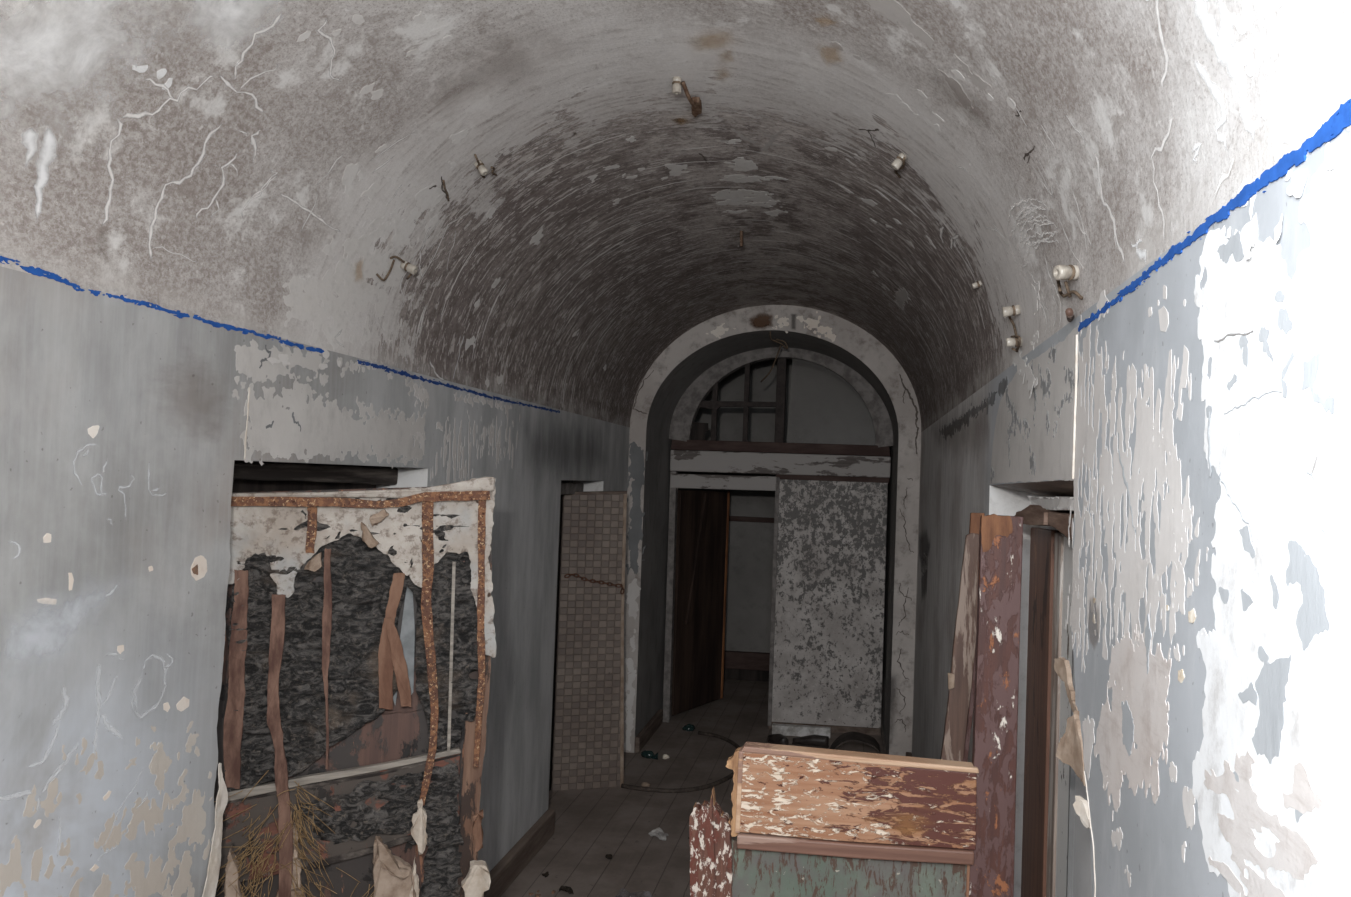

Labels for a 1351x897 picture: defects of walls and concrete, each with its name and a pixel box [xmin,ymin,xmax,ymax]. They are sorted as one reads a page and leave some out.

peeling [587,165,645,183]
peeling [661,163,688,181]
peeling [711,139,788,216]
peeling [839,185,902,228]
peeling [530,228,544,245]
peeling [232,183,449,422]
peeling [706,323,736,339]
peeling [772,311,836,342]
peeling [414,374,521,484]
peeling [1054,0,1351,897]
peeling [0,697,228,897]